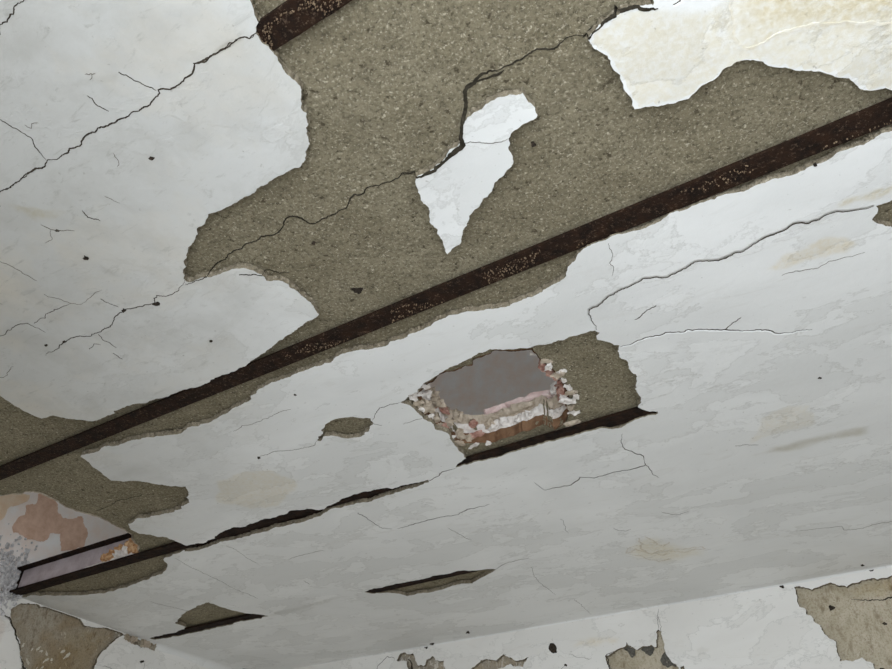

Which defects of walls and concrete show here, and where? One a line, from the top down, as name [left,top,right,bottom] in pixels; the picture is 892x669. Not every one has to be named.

crack [0,0,684,359]
flaking render [185,0,892,362]
crack [621,306,812,348]
crack [586,205,874,330]
flaking render [406,331,641,457]
flaking render [0,250,577,669]
flaking render [607,631,685,669]
flaking render [796,564,892,669]